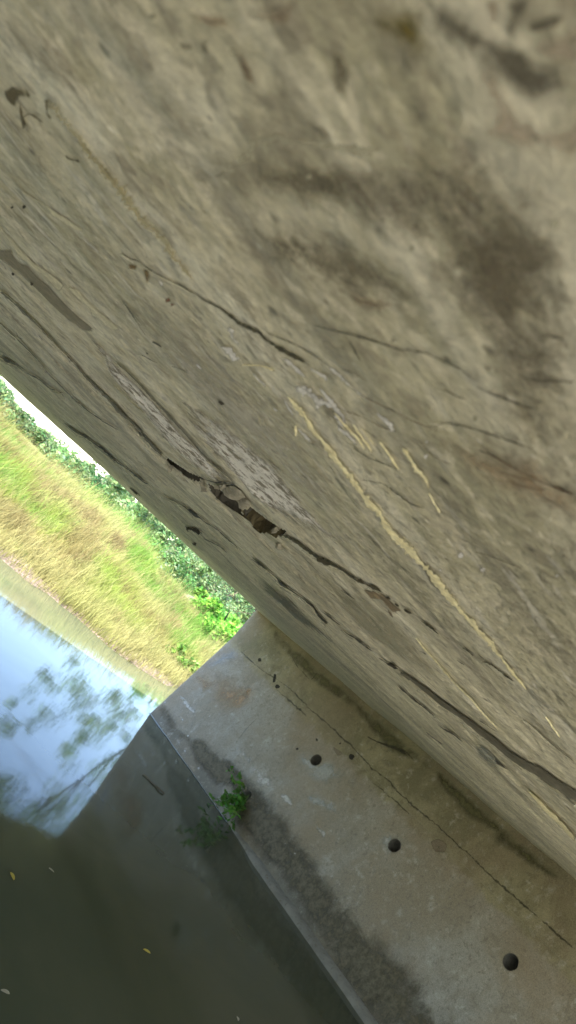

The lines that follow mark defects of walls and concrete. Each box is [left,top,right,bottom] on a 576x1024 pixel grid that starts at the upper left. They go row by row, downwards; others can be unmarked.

peeling [0,250,332,550]
crack [120,253,573,507]
crack [0,292,576,808]
water stain [181,735,433,1024]
crack [246,657,572,947]